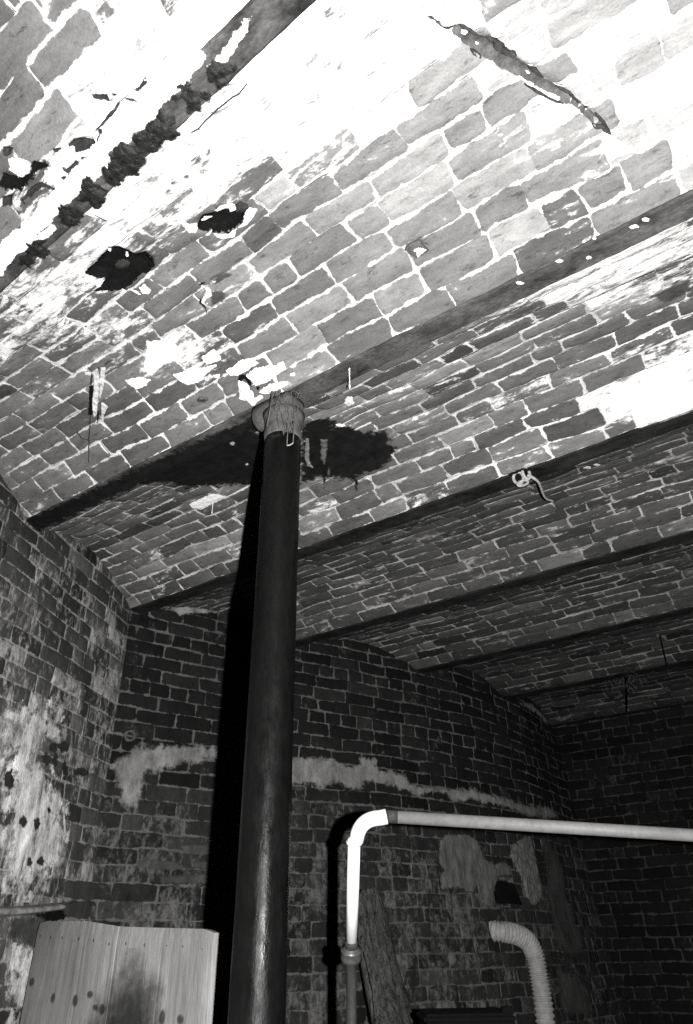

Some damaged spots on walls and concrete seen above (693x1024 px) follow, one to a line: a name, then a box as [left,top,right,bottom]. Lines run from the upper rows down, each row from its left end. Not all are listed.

spalling [93,76,147,119]
corrosion [57,60,237,227]
spalling [0,128,102,206]
spalling [181,201,258,239]
corrosion [18,239,50,268]
spalling [85,246,155,295]
peeling [125,377,151,389]
peeling [173,349,295,394]
leakage [300,418,397,490]